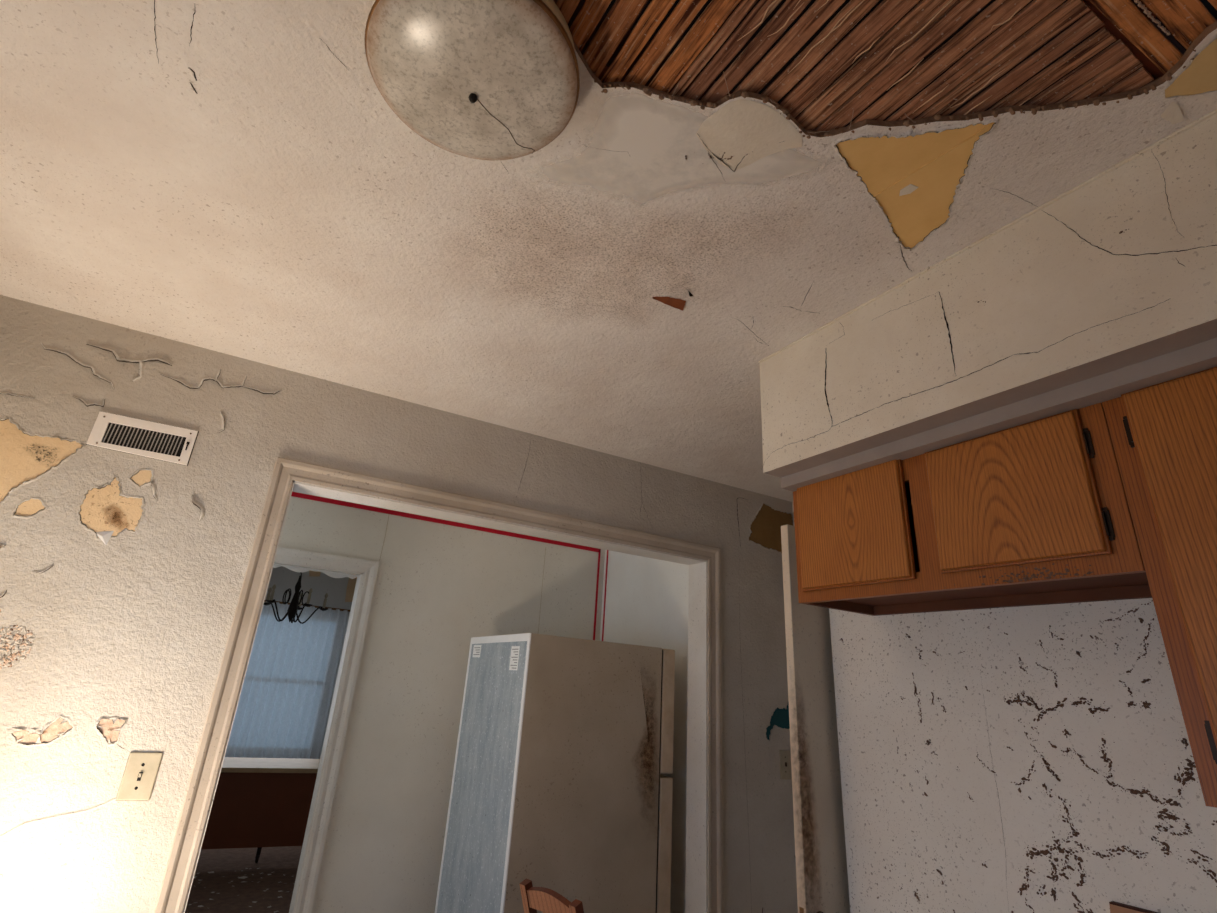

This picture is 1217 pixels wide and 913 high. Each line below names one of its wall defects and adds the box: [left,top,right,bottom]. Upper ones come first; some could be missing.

peeling [1161,38,1217,124]
peeling [832,118,1000,251]
crack [996,152,1217,266]
crack [764,281,1169,463]
peeling [0,417,86,519]
peeling [76,468,159,545]
peeling [747,502,794,555]
spalling [0,590,35,669]
peeling [8,714,76,748]
peeling [93,716,129,747]
peeling [764,696,790,742]